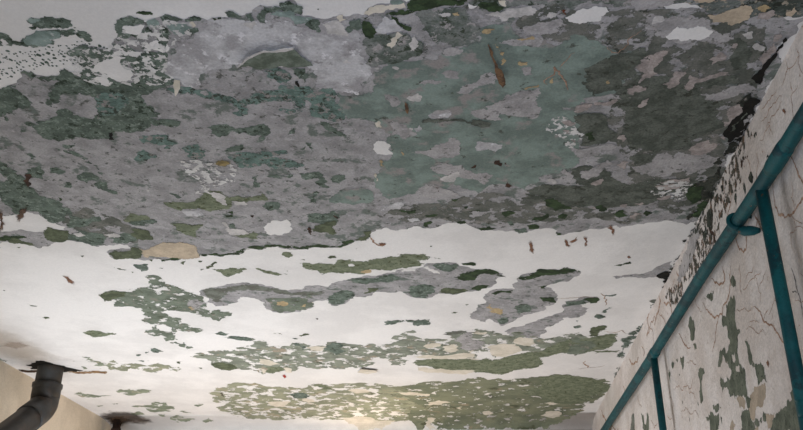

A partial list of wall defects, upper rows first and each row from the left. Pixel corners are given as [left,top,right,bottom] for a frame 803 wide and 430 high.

peeling [0,0,803,307]
crack [747,51,803,246]
spalling [75,389,203,422]
peeling [98,254,643,430]
crack [623,334,699,428]
peeling [688,316,697,349]
crack [629,214,803,378]
peeling [706,275,800,430]